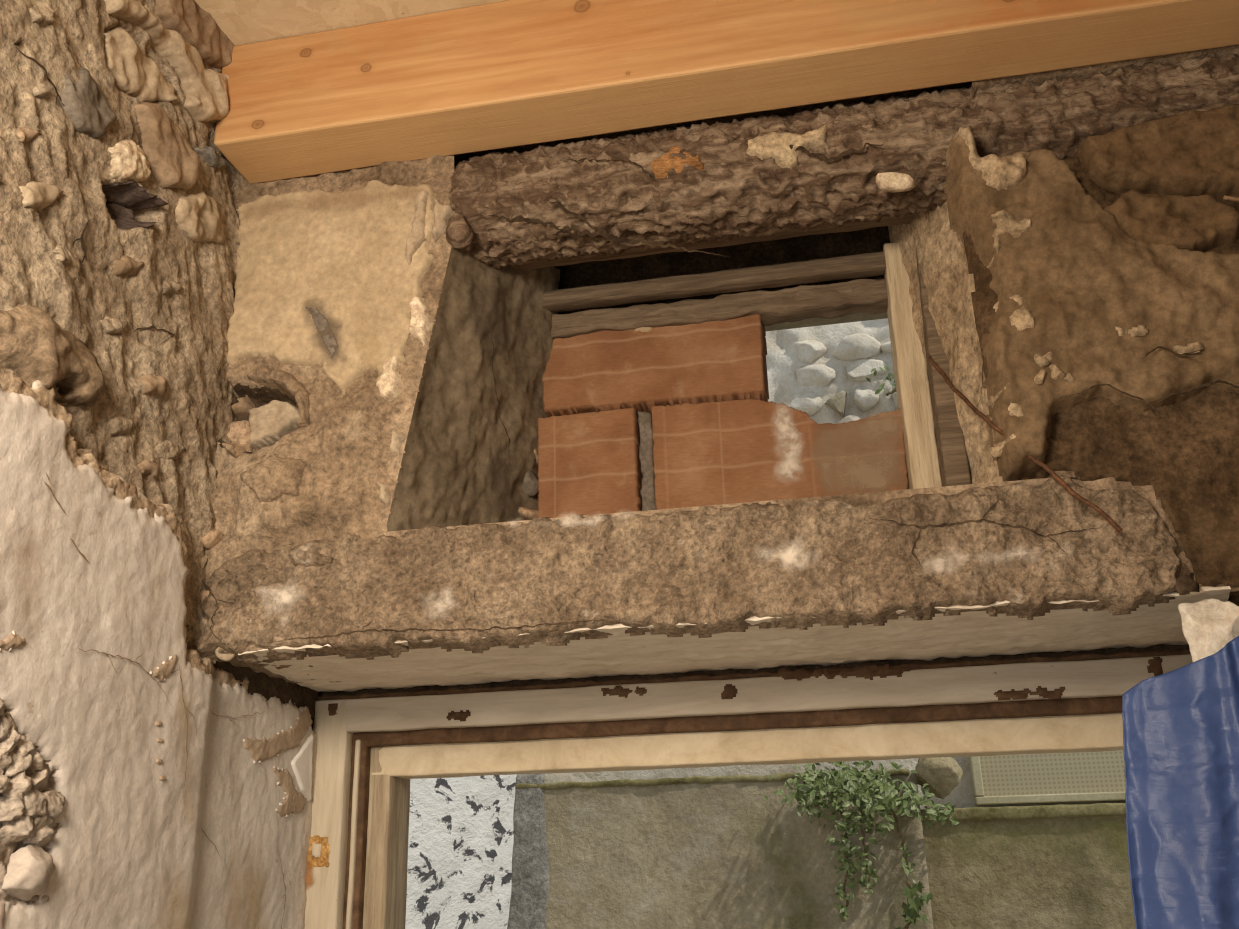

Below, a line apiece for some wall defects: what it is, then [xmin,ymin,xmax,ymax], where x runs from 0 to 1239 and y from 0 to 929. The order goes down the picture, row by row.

crack [1143,346,1207,358]
spalling [232,383,298,421]
crack [1060,380,1239,417]
leakage [777,409,799,477]
flaking render [0,367,249,690]
crack [870,499,1109,569]
peeling [447,710,471,721]
peeling [777,664,912,681]
peeling [994,686,1065,700]
flaking render [243,706,312,818]
spalling [0,698,65,906]
corrosion [306,835,330,886]